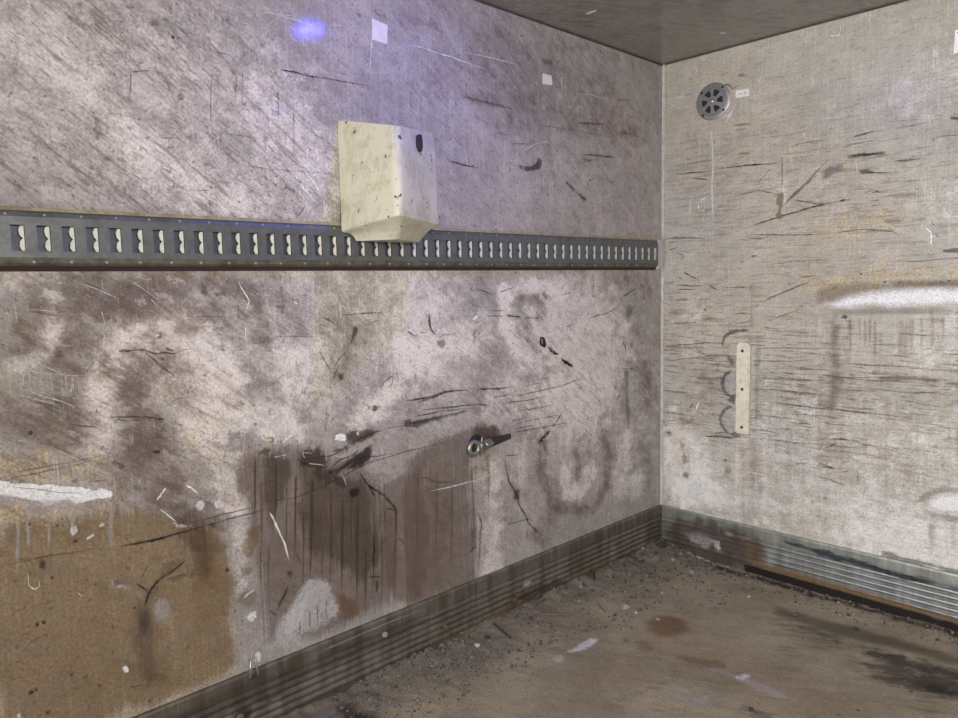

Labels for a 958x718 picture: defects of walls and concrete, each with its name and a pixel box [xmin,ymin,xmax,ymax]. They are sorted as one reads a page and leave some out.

water stain [274,490,343,648]